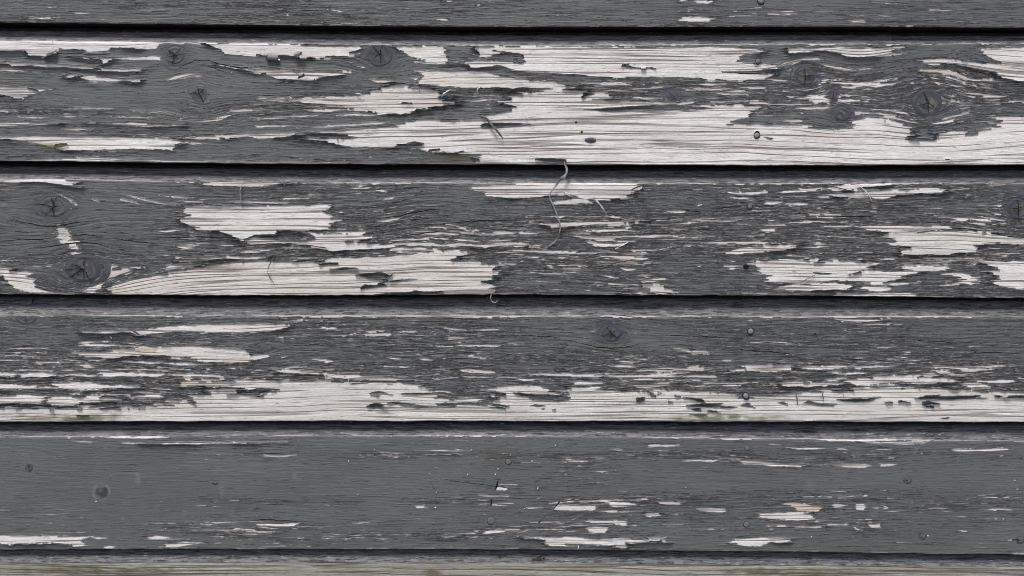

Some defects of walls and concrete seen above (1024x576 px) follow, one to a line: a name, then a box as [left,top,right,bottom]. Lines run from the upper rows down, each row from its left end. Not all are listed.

peeling [0,41,1024,165]
peeling [81,182,679,295]
peeling [725,184,947,205]
peeling [725,214,1024,296]
peeling [0,323,1024,422]